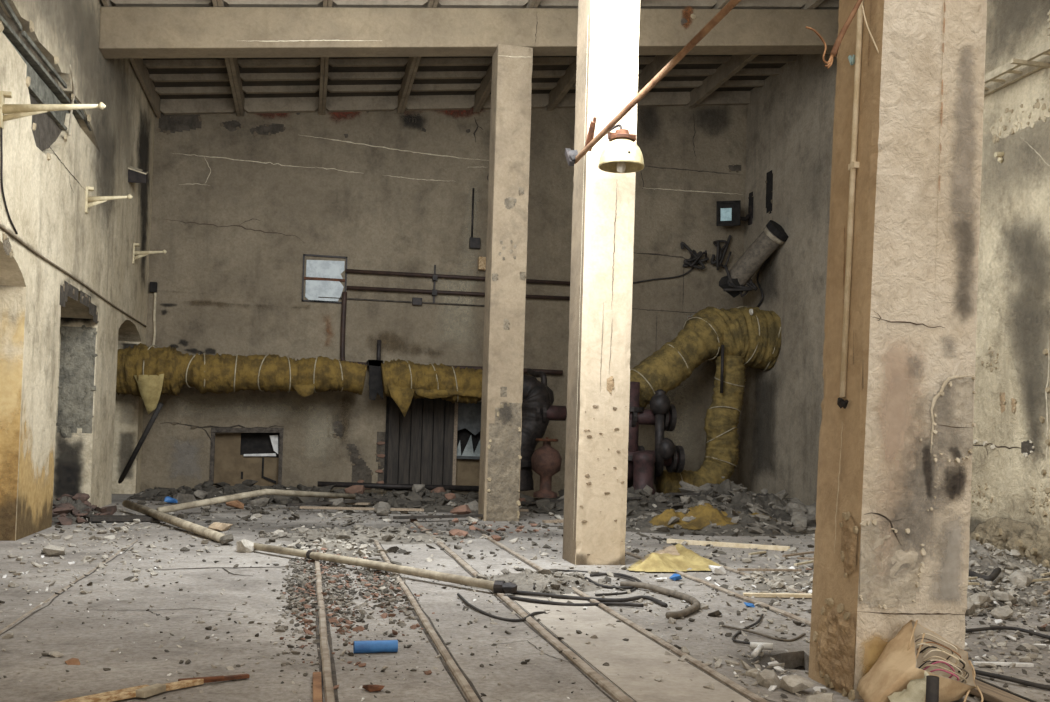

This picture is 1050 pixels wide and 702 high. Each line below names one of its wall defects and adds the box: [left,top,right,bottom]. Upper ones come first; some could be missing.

spalling [0,0,92,160]
peeling [56,281,99,438]
damp [1013,297,1045,448]
damp [0,362,80,541]
damp [923,447,932,497]
damp [949,473,966,495]